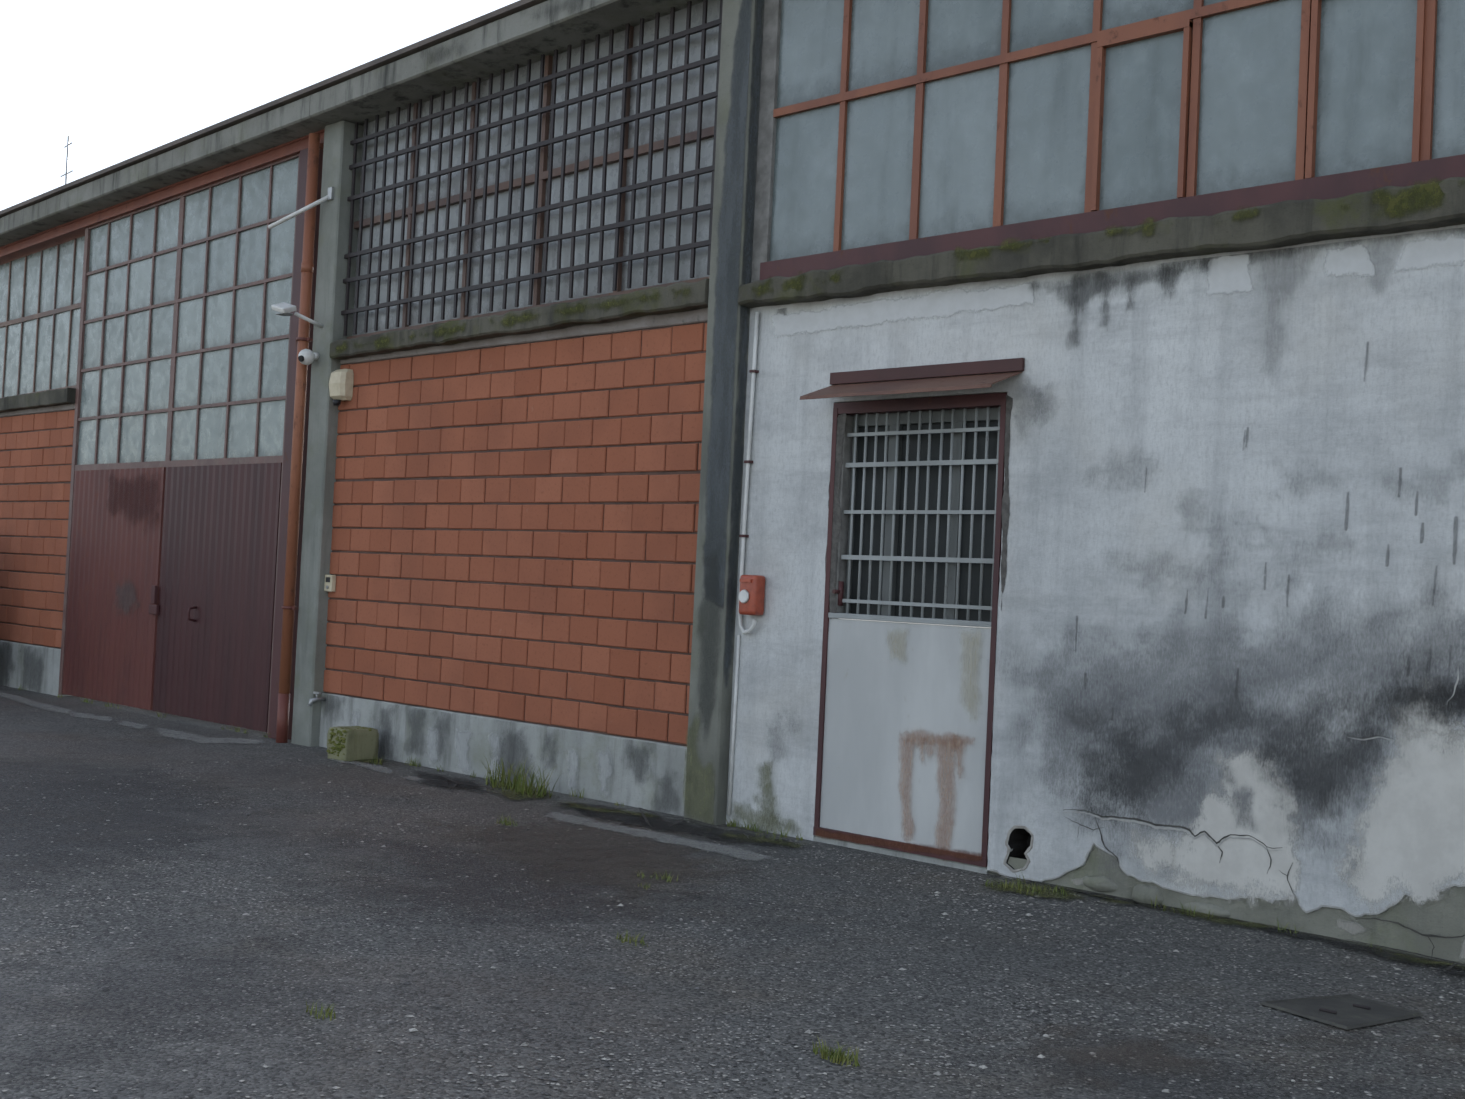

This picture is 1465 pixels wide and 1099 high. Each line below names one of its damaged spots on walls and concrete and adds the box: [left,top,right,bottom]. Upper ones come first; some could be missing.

damp [1059,267,1178,312]
damp [1394,685,1465,720]
corrosion [816,732,982,861]
crack [1063,809,1294,894]
peeling [988,680,1465,965]
damp [1286,717,1378,805]